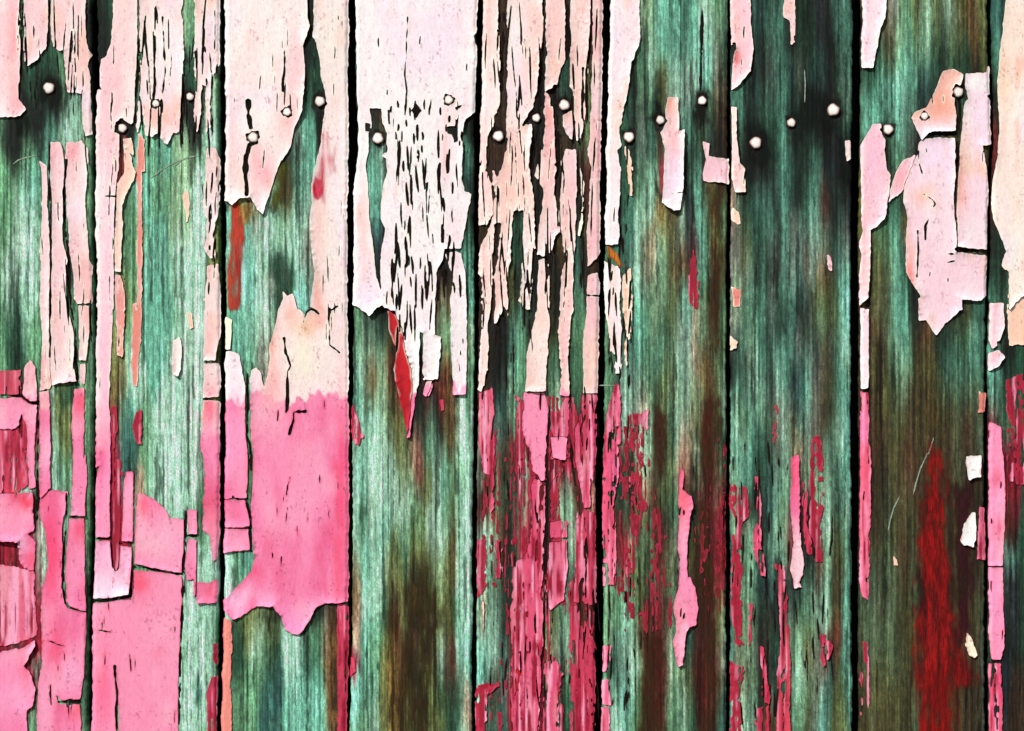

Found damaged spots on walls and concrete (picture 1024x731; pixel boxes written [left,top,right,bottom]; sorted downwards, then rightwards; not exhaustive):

peeling [783,0,795,45]
peeling [0,0,766,731]
peeling [845,0,1024,600]
peeling [755,435,824,731]
peeling [820,634,833,666]
peeling [859,641,870,716]
peeling [960,374,1024,731]